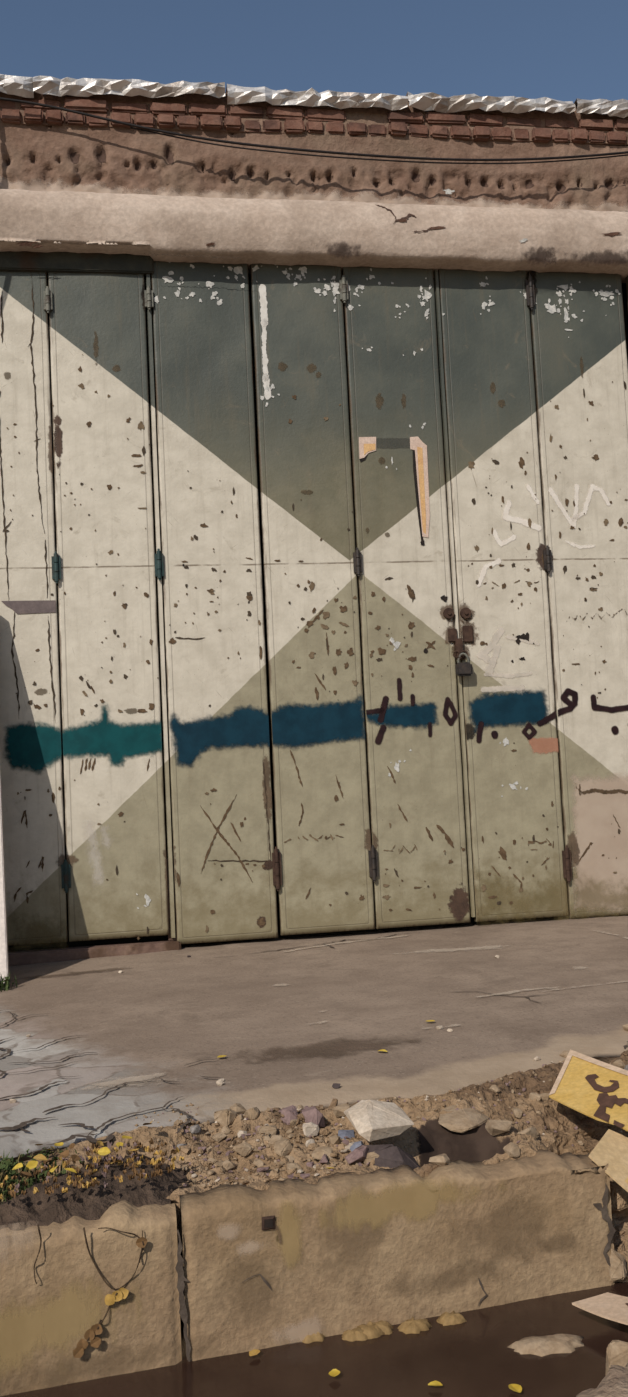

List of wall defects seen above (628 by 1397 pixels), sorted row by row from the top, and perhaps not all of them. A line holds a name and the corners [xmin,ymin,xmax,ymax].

crack [375,204,444,232]
corrosion [568,833,580,866]
crack [0,1009,223,1155]